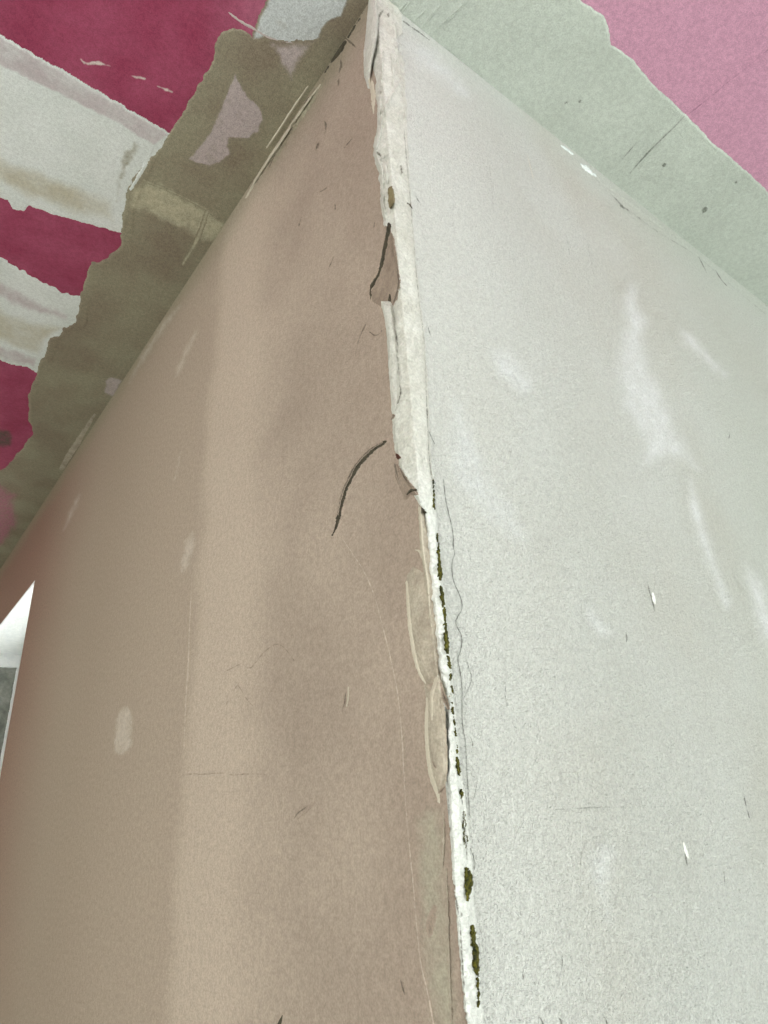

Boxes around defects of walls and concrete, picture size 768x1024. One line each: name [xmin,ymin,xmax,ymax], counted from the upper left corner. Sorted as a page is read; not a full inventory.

peeling [79,58,111,67]
peeling [130,75,173,94]
spalling [388,164,404,209]
crack [328,438,390,539]